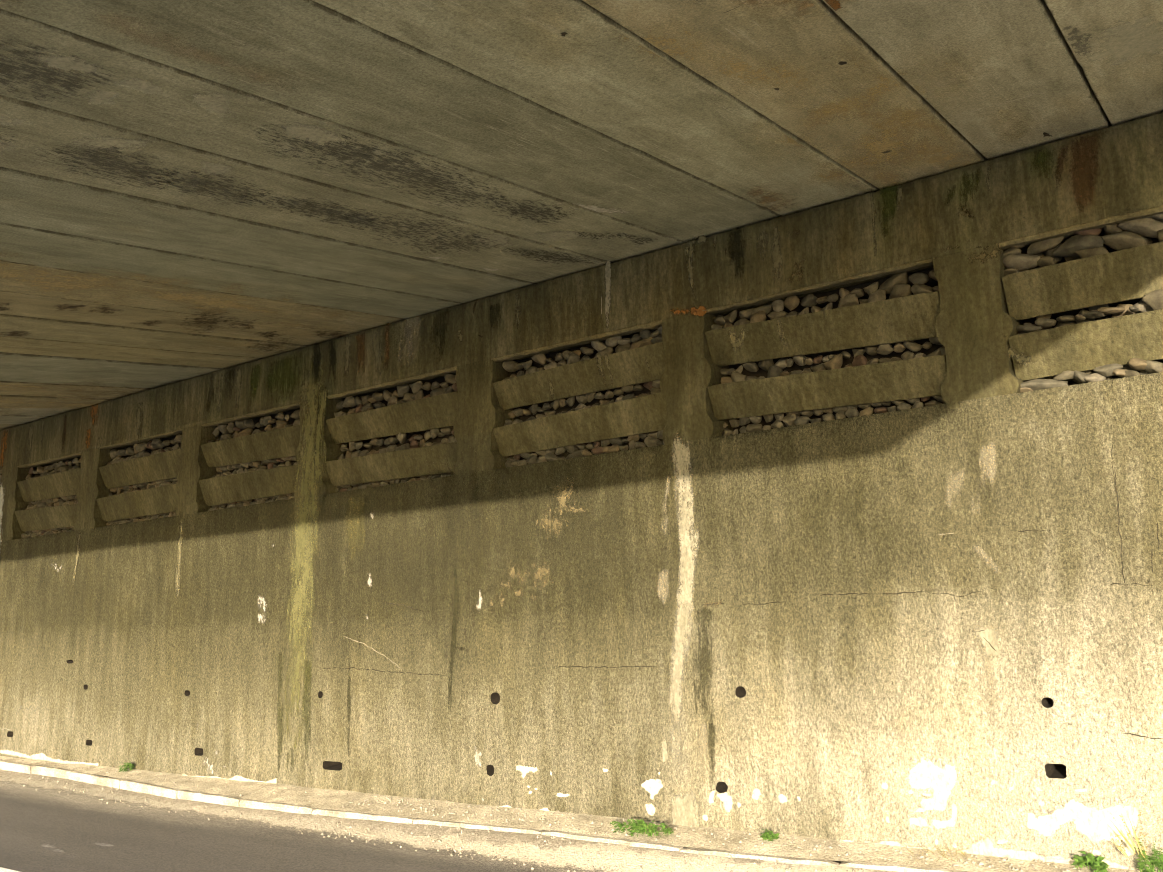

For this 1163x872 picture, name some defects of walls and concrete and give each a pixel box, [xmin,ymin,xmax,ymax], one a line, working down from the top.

rust [1056,133,1104,211]
damp [41,125,612,327]
crack [1111,436,1160,586]
damp [279,334,351,767]
damp [662,435,715,773]
damp [0,750,99,766]
damp [178,774,277,783]
spalling [515,764,552,794]
spalling [641,772,663,816]
spalling [702,789,762,821]
spalling [908,757,957,845]
spalling [1025,787,1140,857]